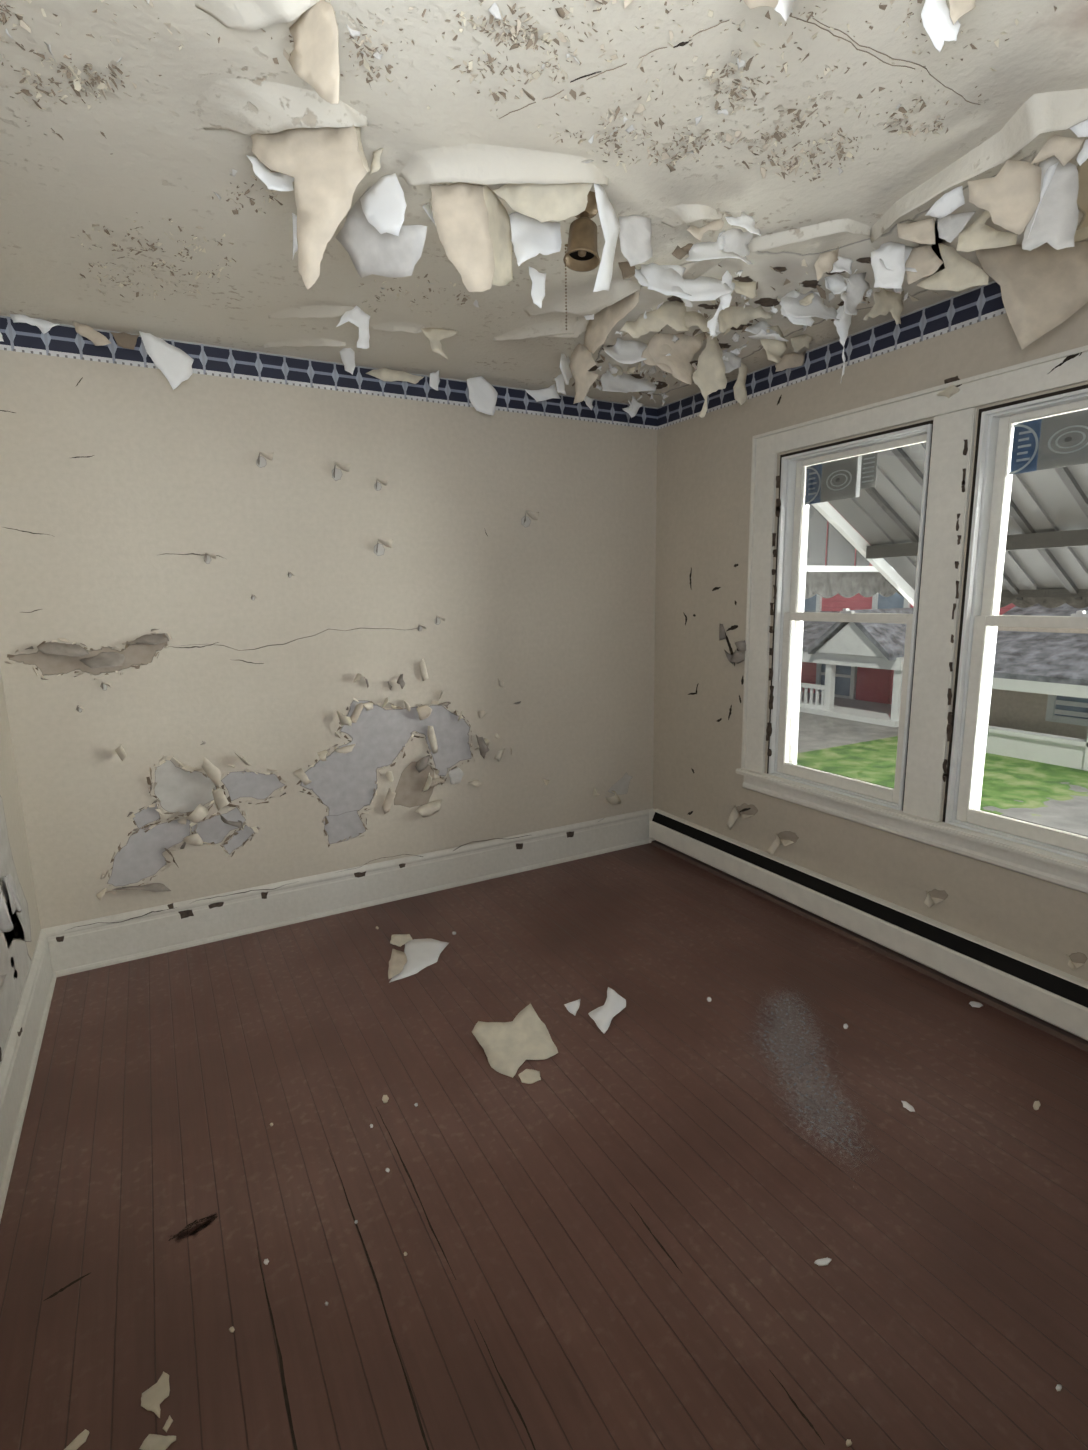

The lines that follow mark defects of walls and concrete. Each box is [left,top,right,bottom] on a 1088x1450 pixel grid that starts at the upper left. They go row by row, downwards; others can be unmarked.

peeling [0,0,139,112]
peeling [72,212,237,300]
peeling [5,615,446,690]
peeling [96,673,512,919]
peeling [0,796,31,1062]